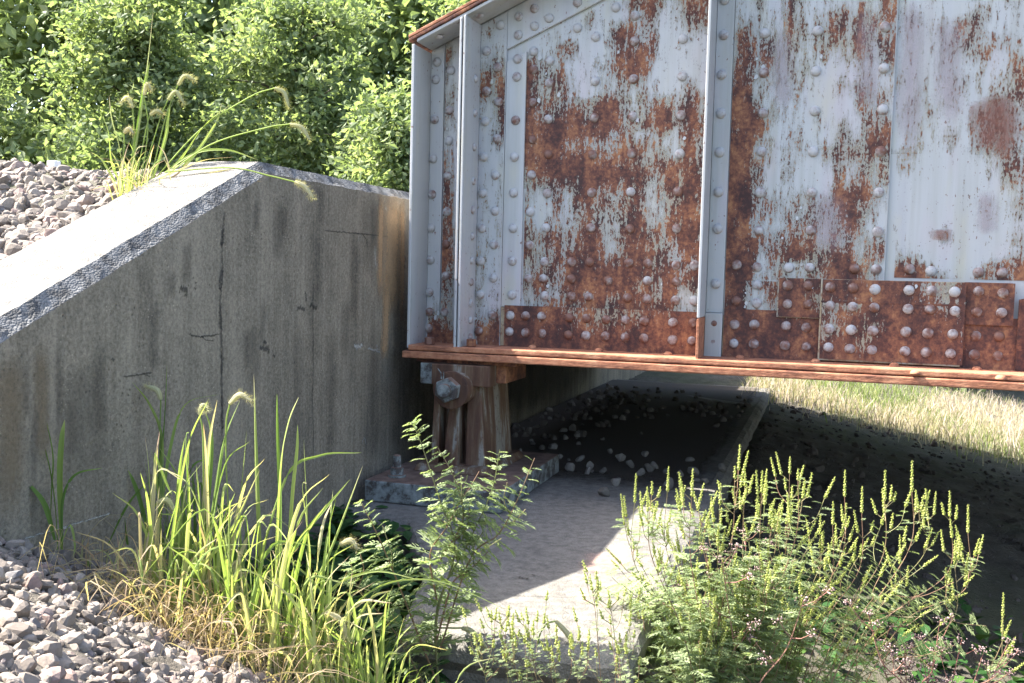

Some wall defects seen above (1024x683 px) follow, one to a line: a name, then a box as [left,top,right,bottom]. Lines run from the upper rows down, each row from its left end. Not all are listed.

corrosion [427,42,457,343]
corrosion [474,0,709,355]
corrosion [722,0,1024,371]